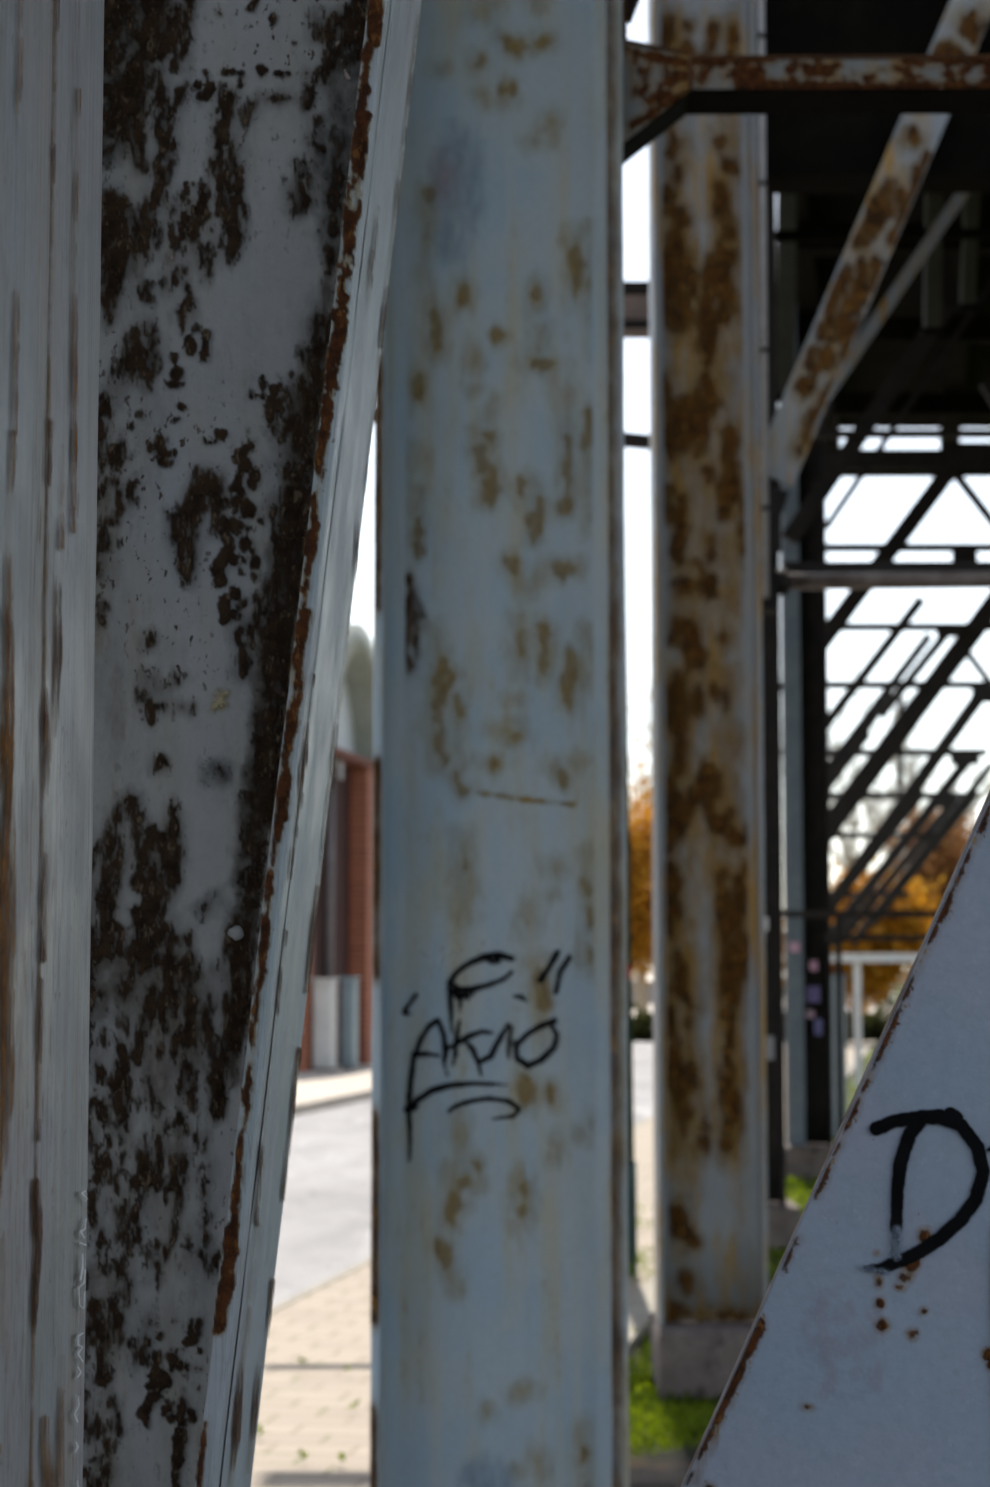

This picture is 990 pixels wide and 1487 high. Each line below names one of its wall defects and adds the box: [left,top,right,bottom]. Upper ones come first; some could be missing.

rust [300,0,393,610]
rust [406,575,422,669]
rust [298,728,309,817]
rust [607,3,990,1487]
rust [373,759,381,977]
rust [292,1048,302,1132]
rust [371,1110,379,1323]
rust [196,1422,207,1487]
rust [234,1370,261,1468]